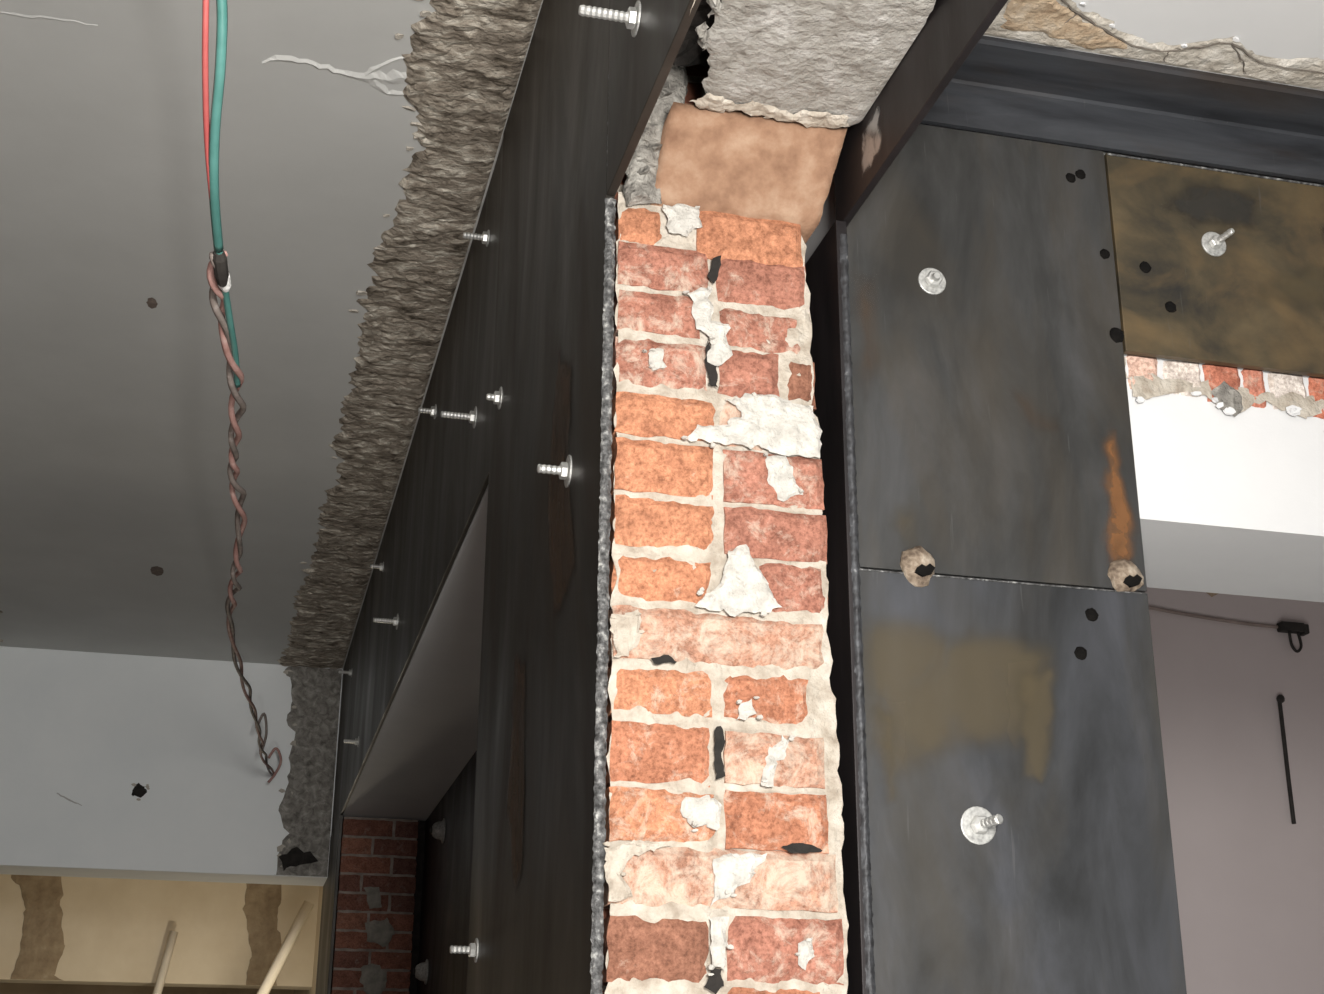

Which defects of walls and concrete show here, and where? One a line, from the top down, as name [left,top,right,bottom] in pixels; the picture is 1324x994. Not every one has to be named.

crack [1061,0,1324,74]
flaking render [1124,354,1324,419]
flaking render [243,0,542,986]
rust [1107,439,1132,560]